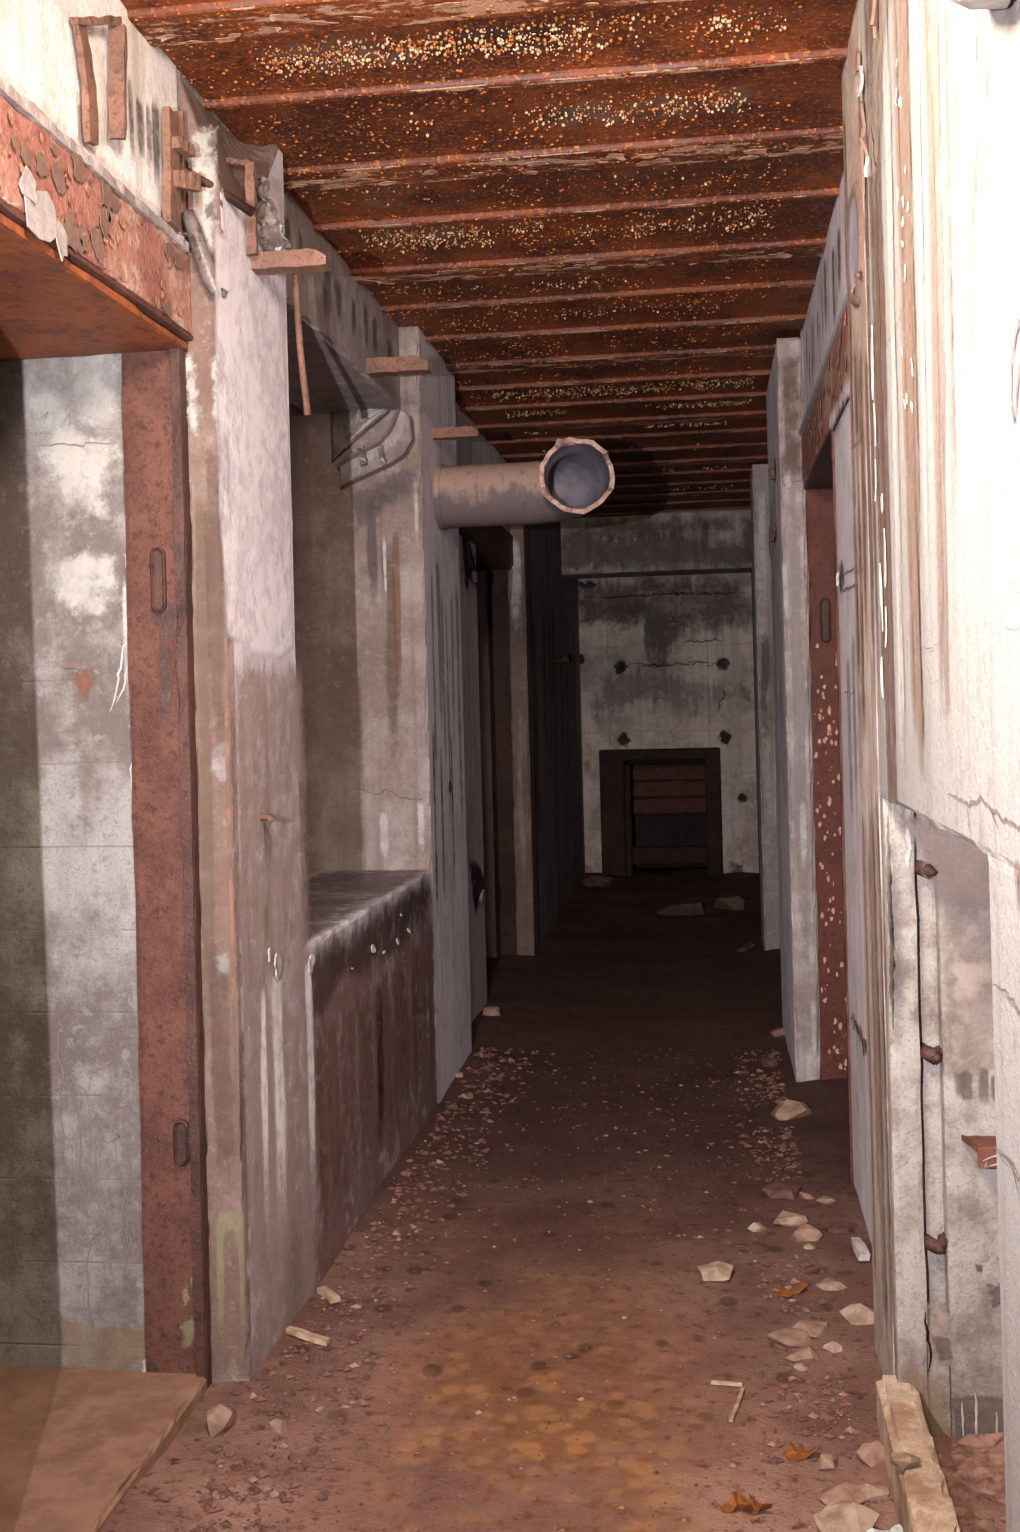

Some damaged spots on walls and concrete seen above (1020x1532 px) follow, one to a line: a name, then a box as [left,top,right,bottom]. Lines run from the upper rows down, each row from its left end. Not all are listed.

peeling [156,33,241,43]
peeling [269,14,285,32]
peeling [307,16,373,25]
corrosion [174,111,255,217]
leakage [24,354,122,516]
leakage [57,552,128,711]
leakage [744,0,987,1326]
crack [947,793,1020,833]
peeling [903,819,994,1070]
crack [991,981,1020,1016]
leakage [956,1070,995,1099]
leakage [976,1264,1000,1306]